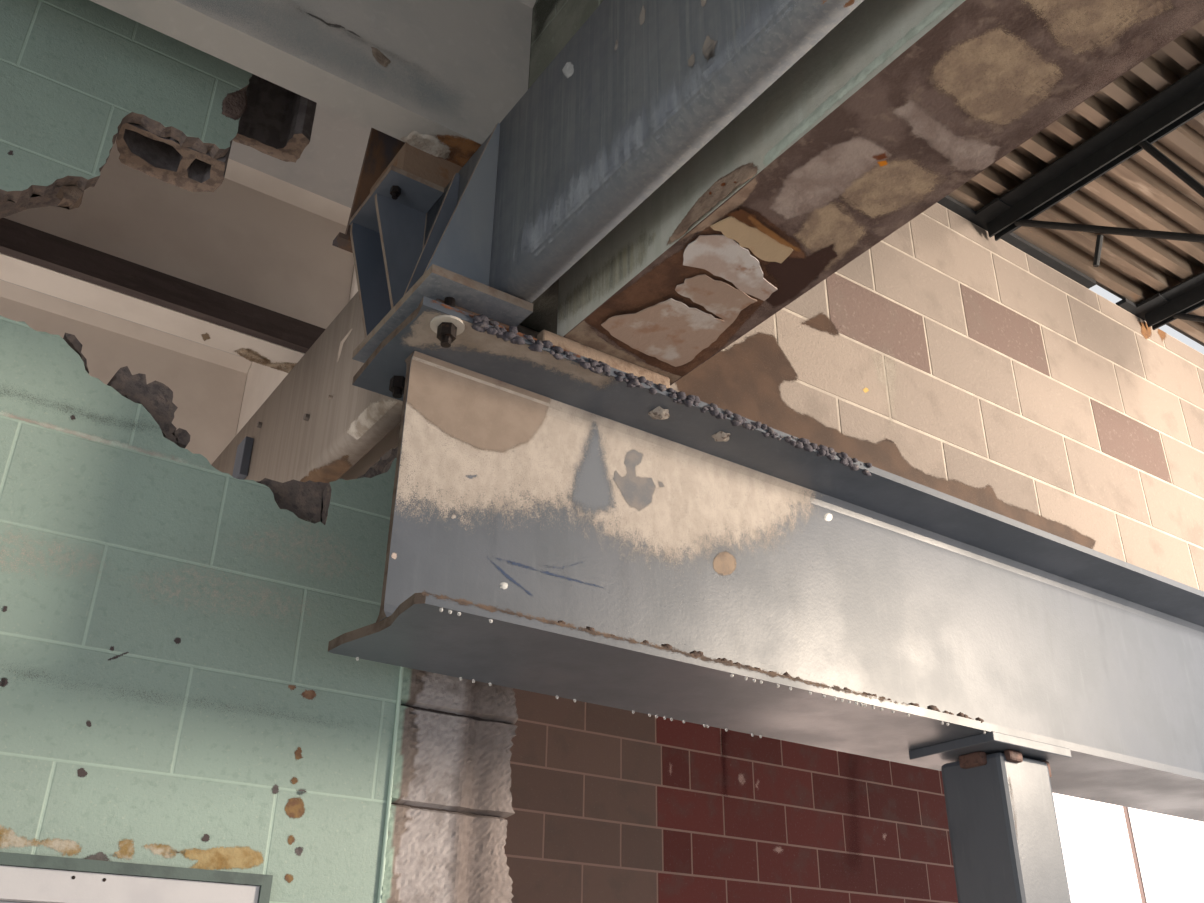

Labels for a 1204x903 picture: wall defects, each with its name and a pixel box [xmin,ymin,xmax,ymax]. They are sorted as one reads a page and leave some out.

spalling [222,90,248,120]
peeling [565,0,956,383]
spalling [63,333,89,374]
spalling [233,348,297,373]
spalling [107,366,178,444]
damp [394,311,824,577]
spalling [256,478,329,524]
peeling [0,825,264,871]